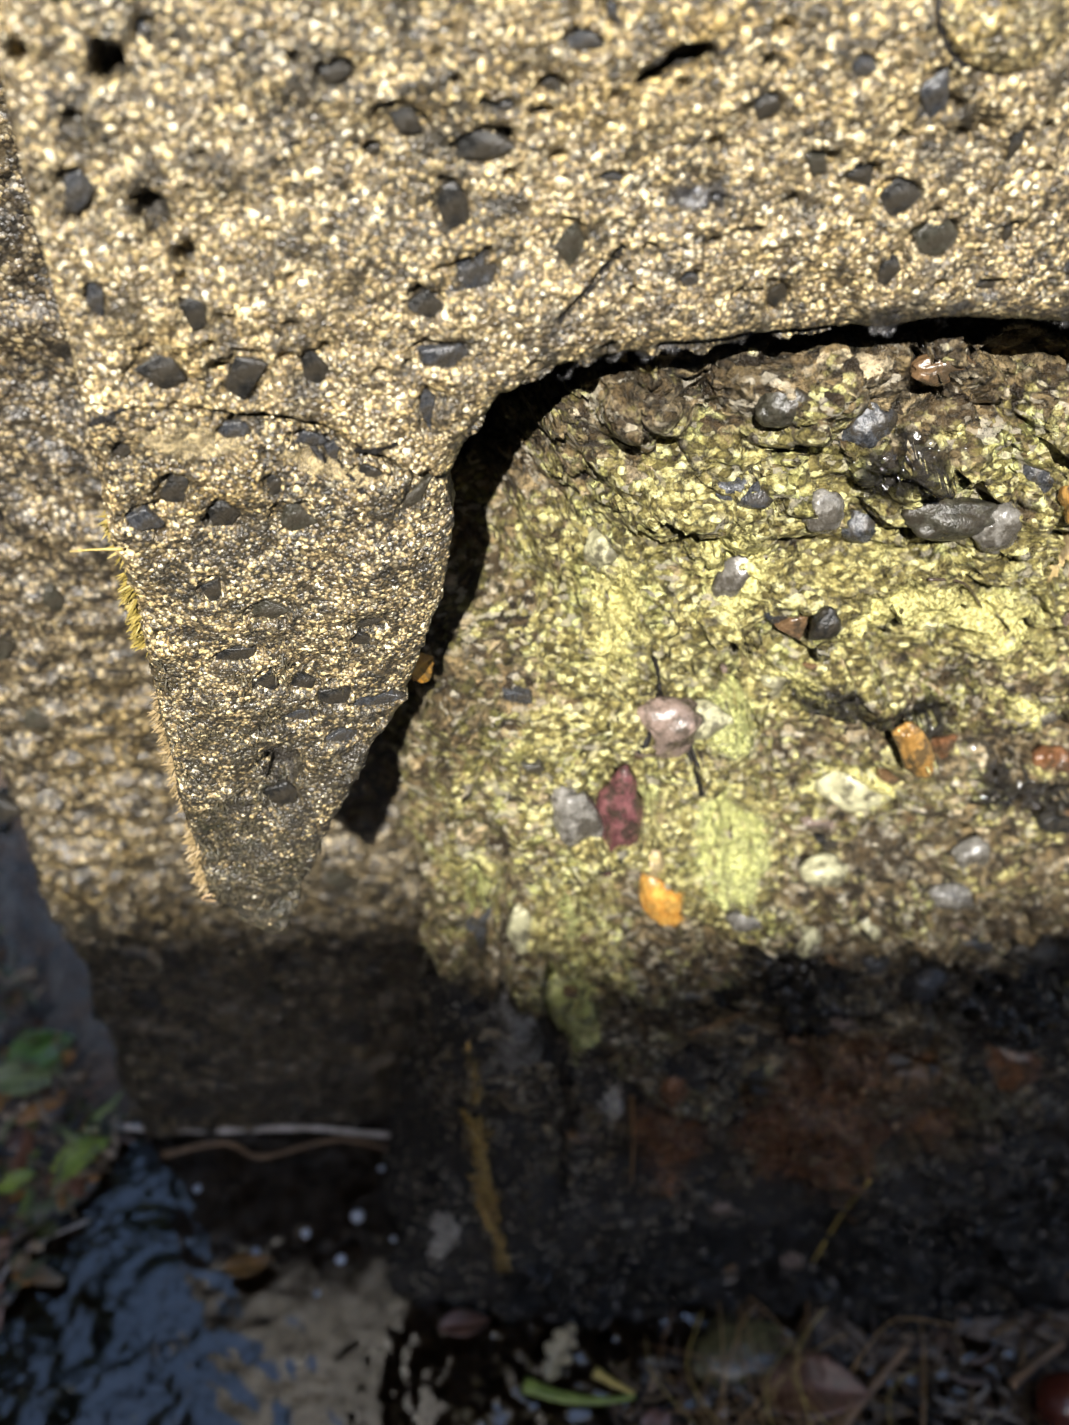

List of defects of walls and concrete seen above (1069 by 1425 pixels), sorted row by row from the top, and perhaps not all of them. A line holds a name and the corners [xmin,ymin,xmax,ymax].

crack [558,245,627,324]
crack [86,408,125,428]
crack [309,441,398,494]
spalling [379,316,1069,1334]